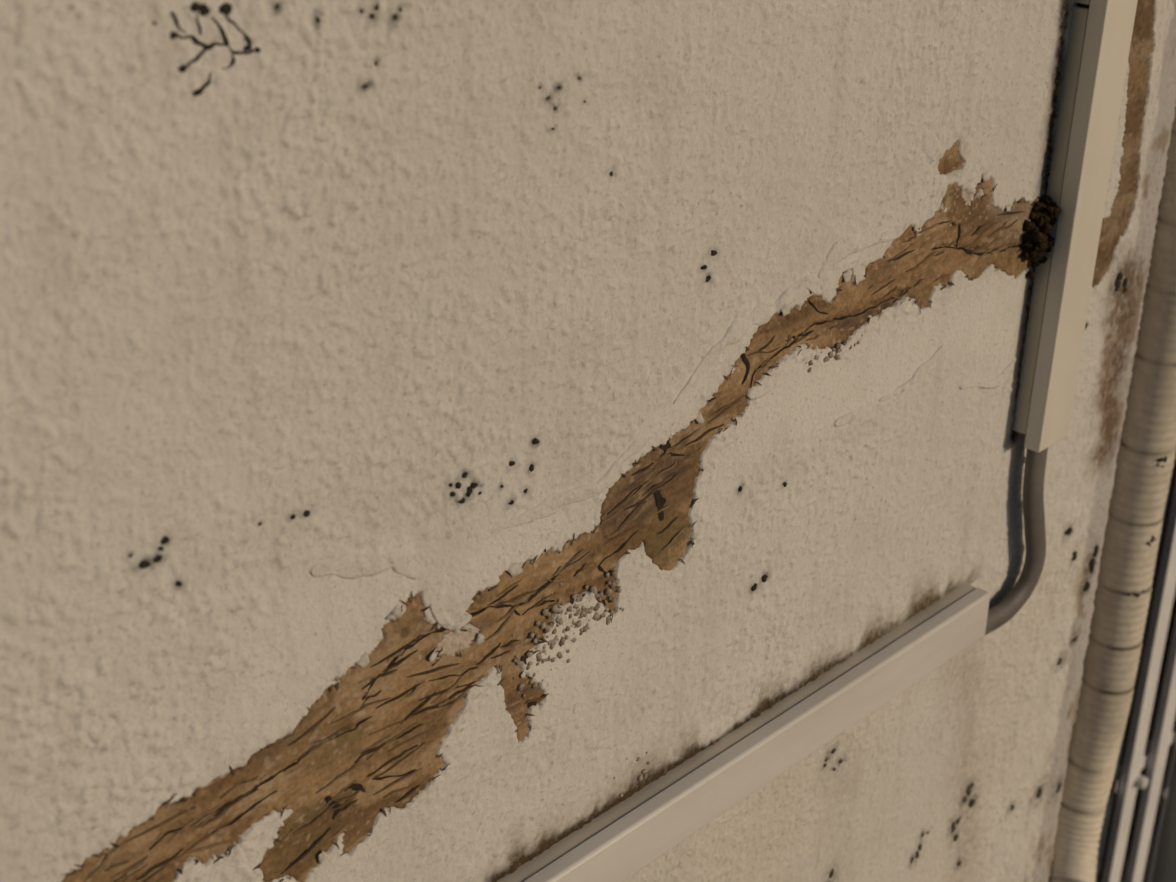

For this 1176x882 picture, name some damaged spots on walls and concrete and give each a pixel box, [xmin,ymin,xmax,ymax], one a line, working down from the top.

spalling [1092,0,1155,287]
spalling [62,141,1039,882]
leakage [963,783,976,808]